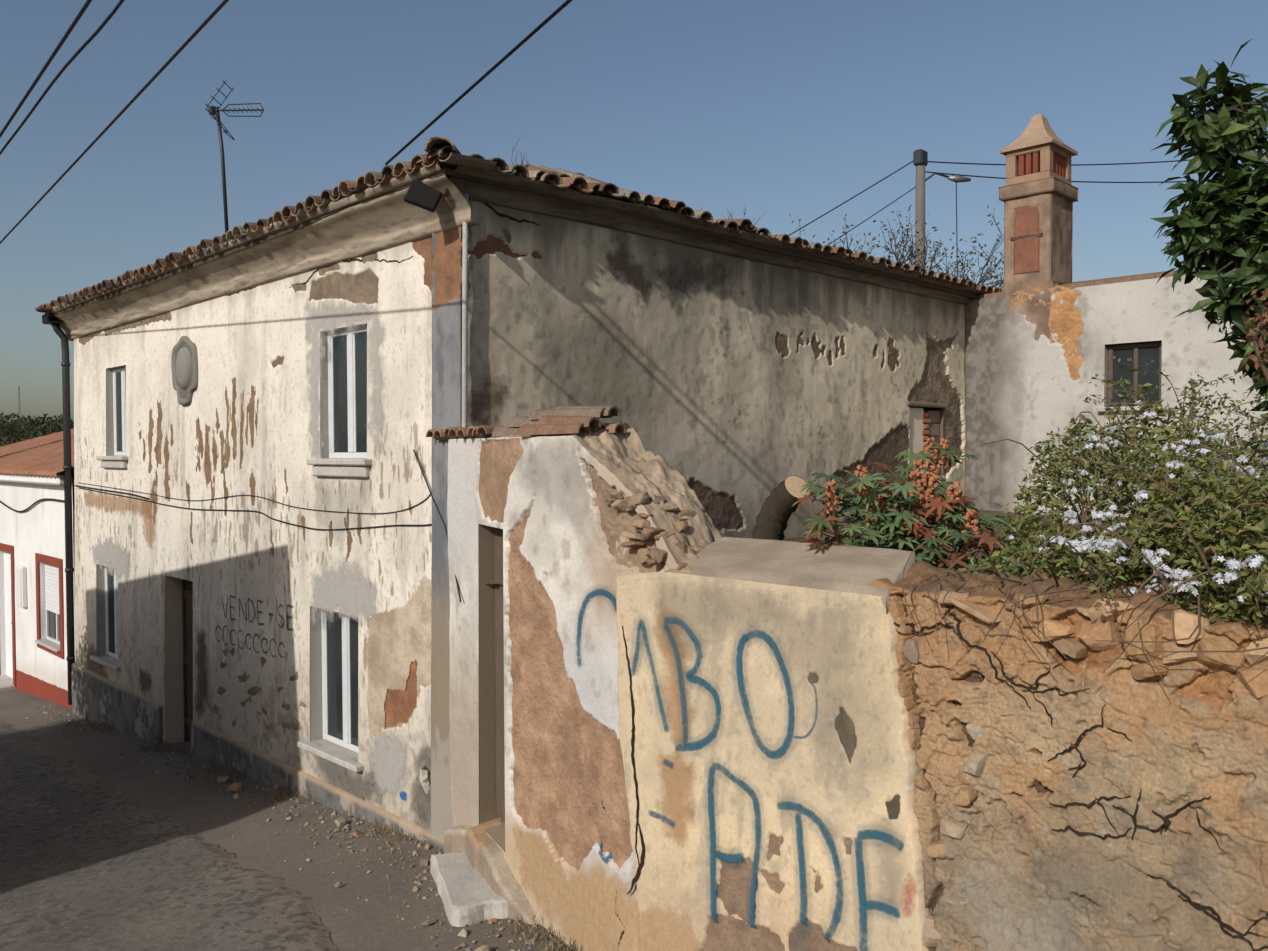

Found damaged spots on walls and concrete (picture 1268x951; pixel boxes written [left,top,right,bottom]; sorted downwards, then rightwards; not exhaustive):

crack [482,202,541,226]
peeling [291,252,379,304]
crack [289,256,413,288]
flaking render [412,226,542,316]
flaking render [908,335,962,478]
flaking render [822,423,912,505]
flaking render [366,578,432,738]
flaking render [479,435,633,871]
crack [894,573,1226,853]
flaking render [700,834,857,951]
crack [930,885,944,915]
crack [1147,874,1268,951]